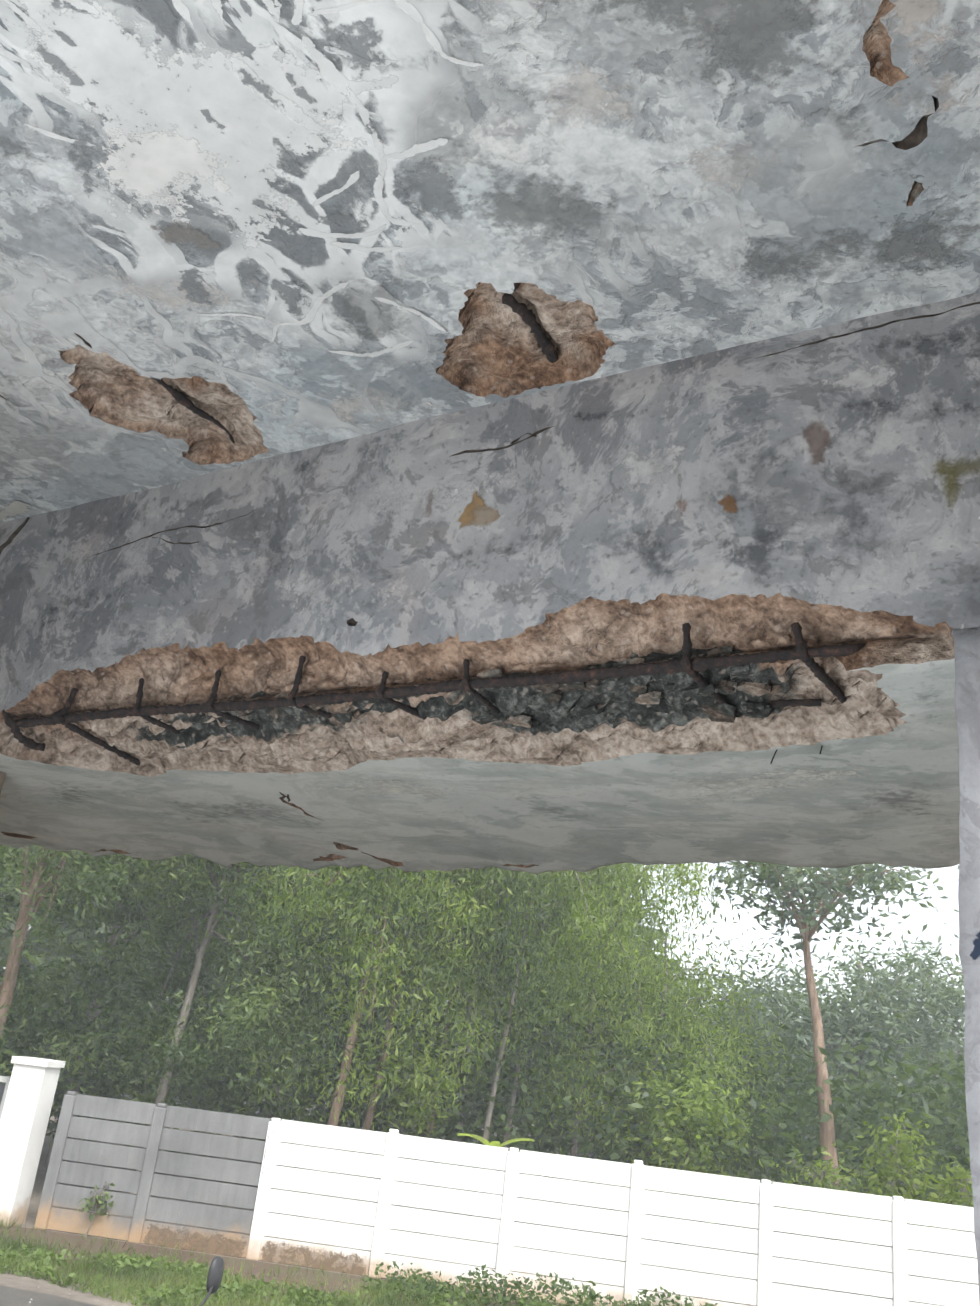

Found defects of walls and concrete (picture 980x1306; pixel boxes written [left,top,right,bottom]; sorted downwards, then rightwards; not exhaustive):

water stain [592,0,817,95]
flaking render [862,0,909,87]
water stain [0,0,484,448]
water stain [482,175,667,305]
water stain [741,213,980,278]
spalling [436,282,615,398]
crack [755,302,980,359]
water stain [900,335,961,357]
spalling [59,333,269,465]
crack [0,517,30,554]
crack [89,505,263,557]
spalling [0,593,955,777]